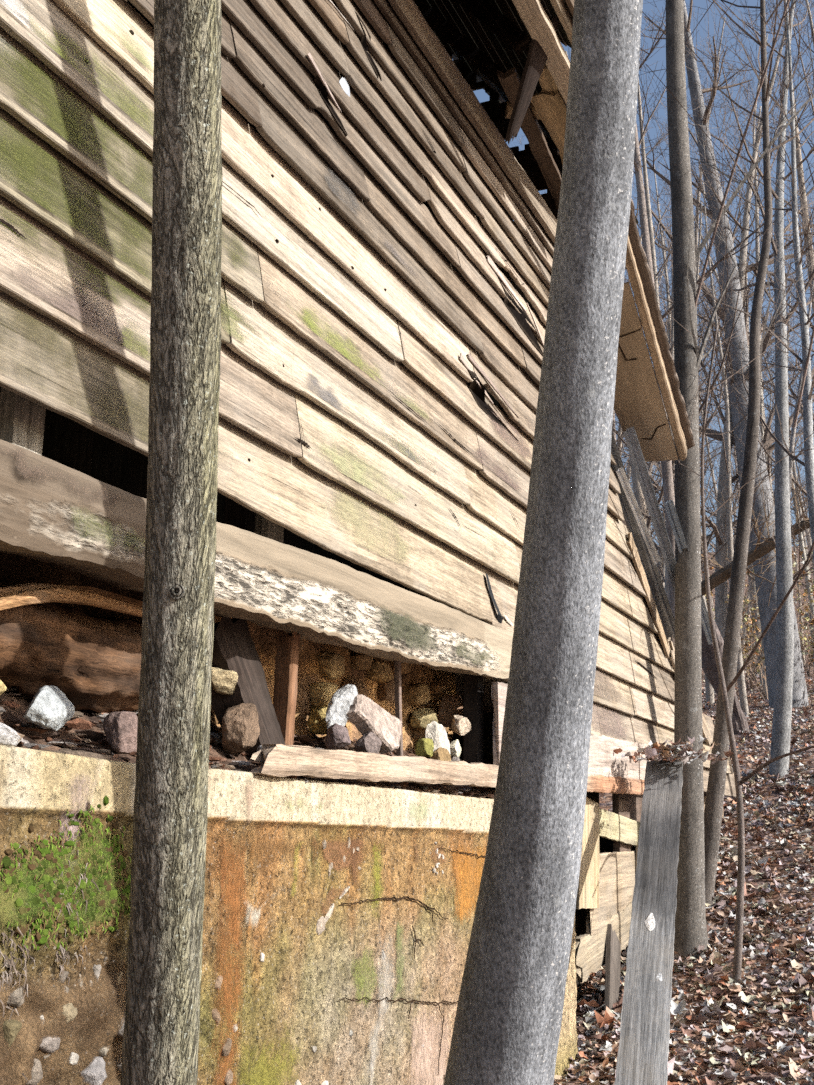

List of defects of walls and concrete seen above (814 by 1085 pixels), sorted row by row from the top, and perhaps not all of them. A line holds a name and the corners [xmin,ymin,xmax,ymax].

corrosion [454,853,483,919]
crack [341,896,449,959]